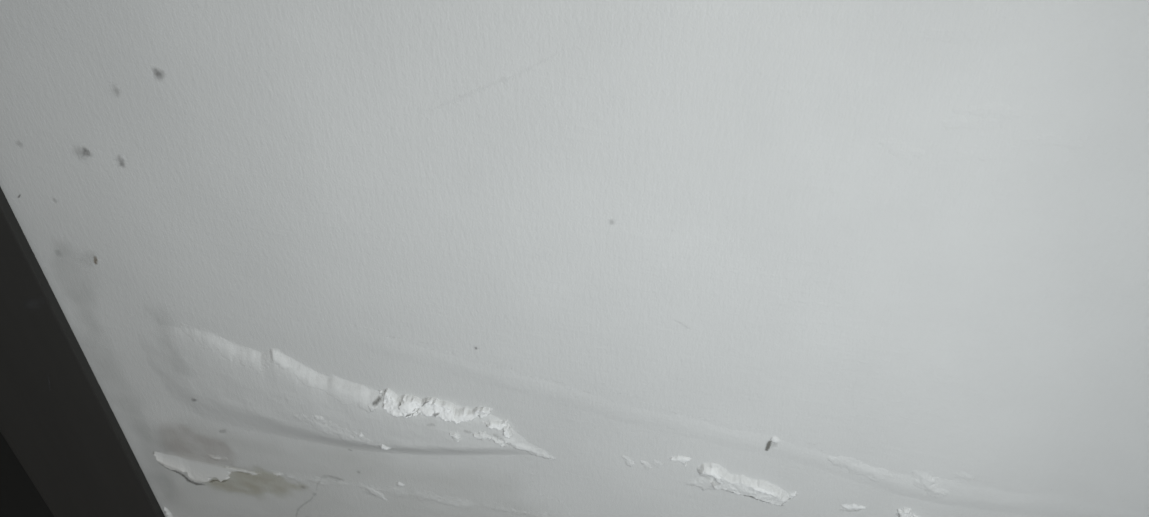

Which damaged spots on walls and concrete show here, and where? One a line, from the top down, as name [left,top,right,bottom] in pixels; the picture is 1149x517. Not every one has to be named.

peeling [154,450,284,485]
peeling [667,455,797,506]